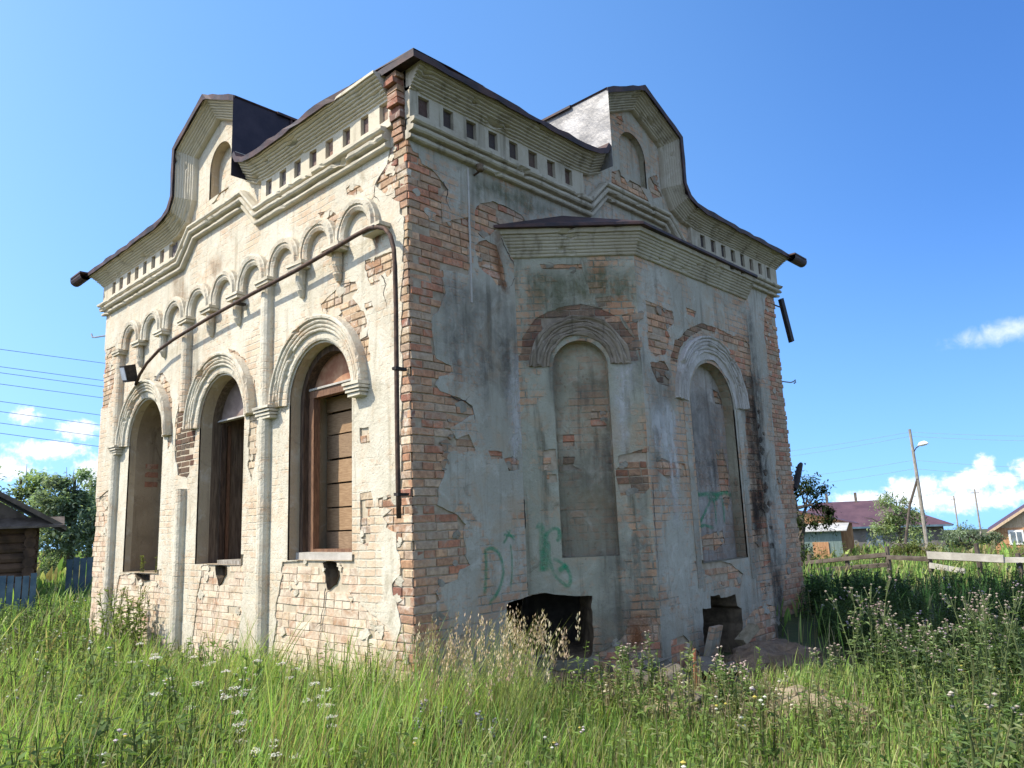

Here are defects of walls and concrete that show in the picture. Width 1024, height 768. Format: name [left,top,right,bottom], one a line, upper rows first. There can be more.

spalling [270,93,524,702]
spalling [507,295,806,688]
water stain [745,374,782,634]